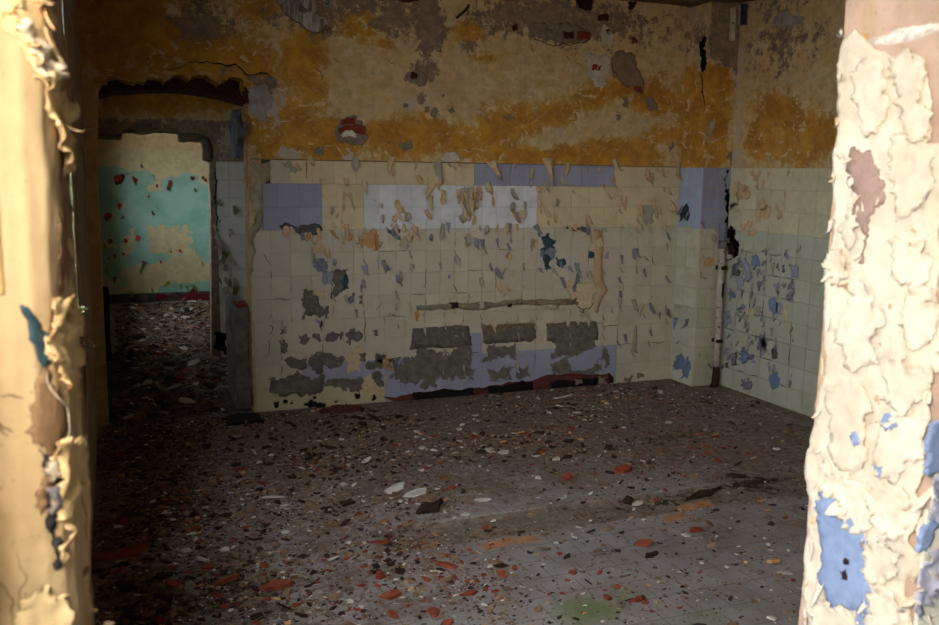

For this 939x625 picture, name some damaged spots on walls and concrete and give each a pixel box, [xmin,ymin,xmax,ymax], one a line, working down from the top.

peeling [634,0,756,8]
flaking render [512,21,592,47]
crack [167,61,272,79]
spalling [610,37,658,121]
spalling [695,35,707,104]
spalling [334,115,368,145]
peeling [151,281,210,301]
peeling [268,151,801,408]
peeling [797,28,939,625]
peeling [20,202,98,570]
peeling [403,487,427,497]
peeling [13,584,76,625]